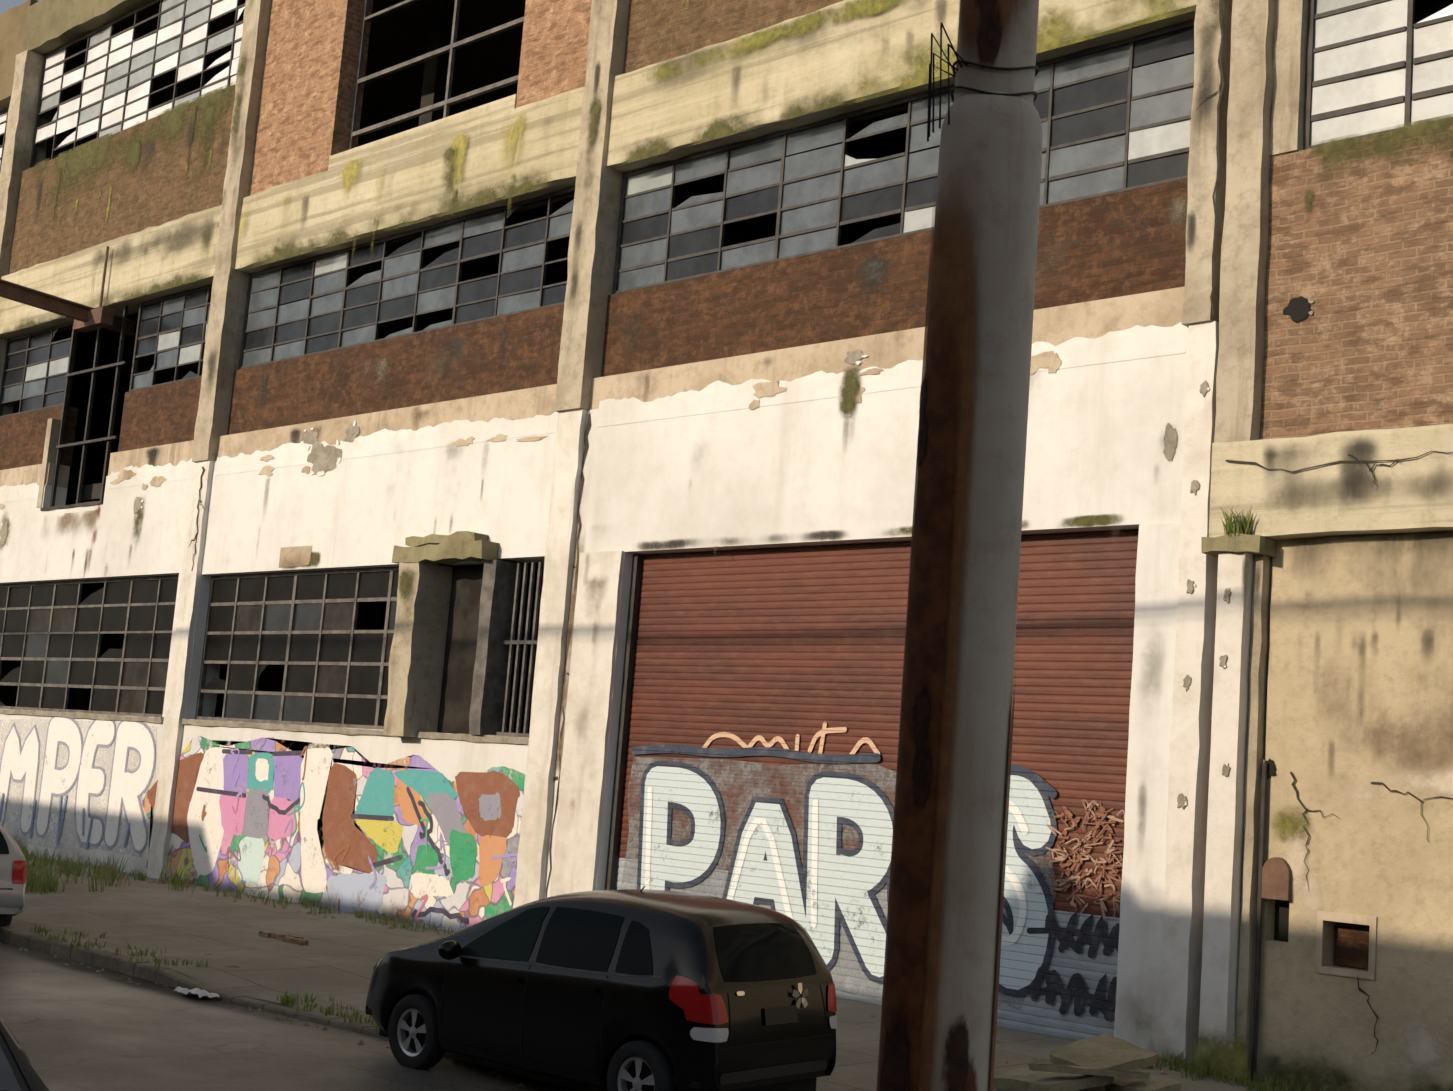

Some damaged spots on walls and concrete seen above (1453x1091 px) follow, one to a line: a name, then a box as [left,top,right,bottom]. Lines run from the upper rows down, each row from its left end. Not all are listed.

rust [960,0,1018,64]
crack [1196,0,1224,315]
peeling [1030,322,1187,375]
peeling [596,349,923,427]
peeling [0,483,38,547]
peeling [107,459,195,514]
peeling [214,412,558,477]
crack [1225,451,1453,491]
rust [876,207,1015,1091]
crack [1290,771,1338,890]
crack [1371,782,1453,842]